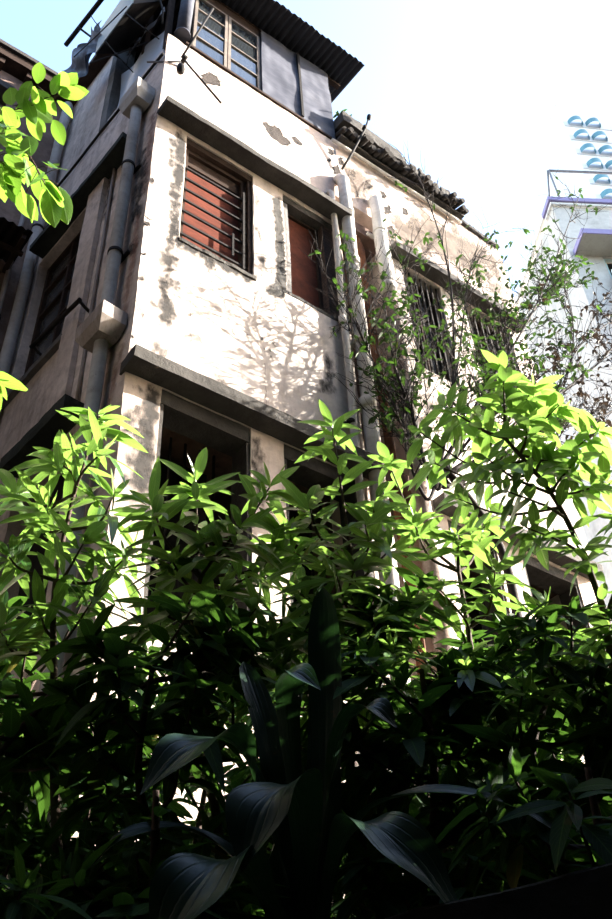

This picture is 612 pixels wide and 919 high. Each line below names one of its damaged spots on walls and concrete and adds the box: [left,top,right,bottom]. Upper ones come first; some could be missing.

peeling [201,72,221,87]
spalling [263,122,303,146]
water stain [151,132,256,326]
water stain [320,356,334,392]
water stain [123,385,161,521]